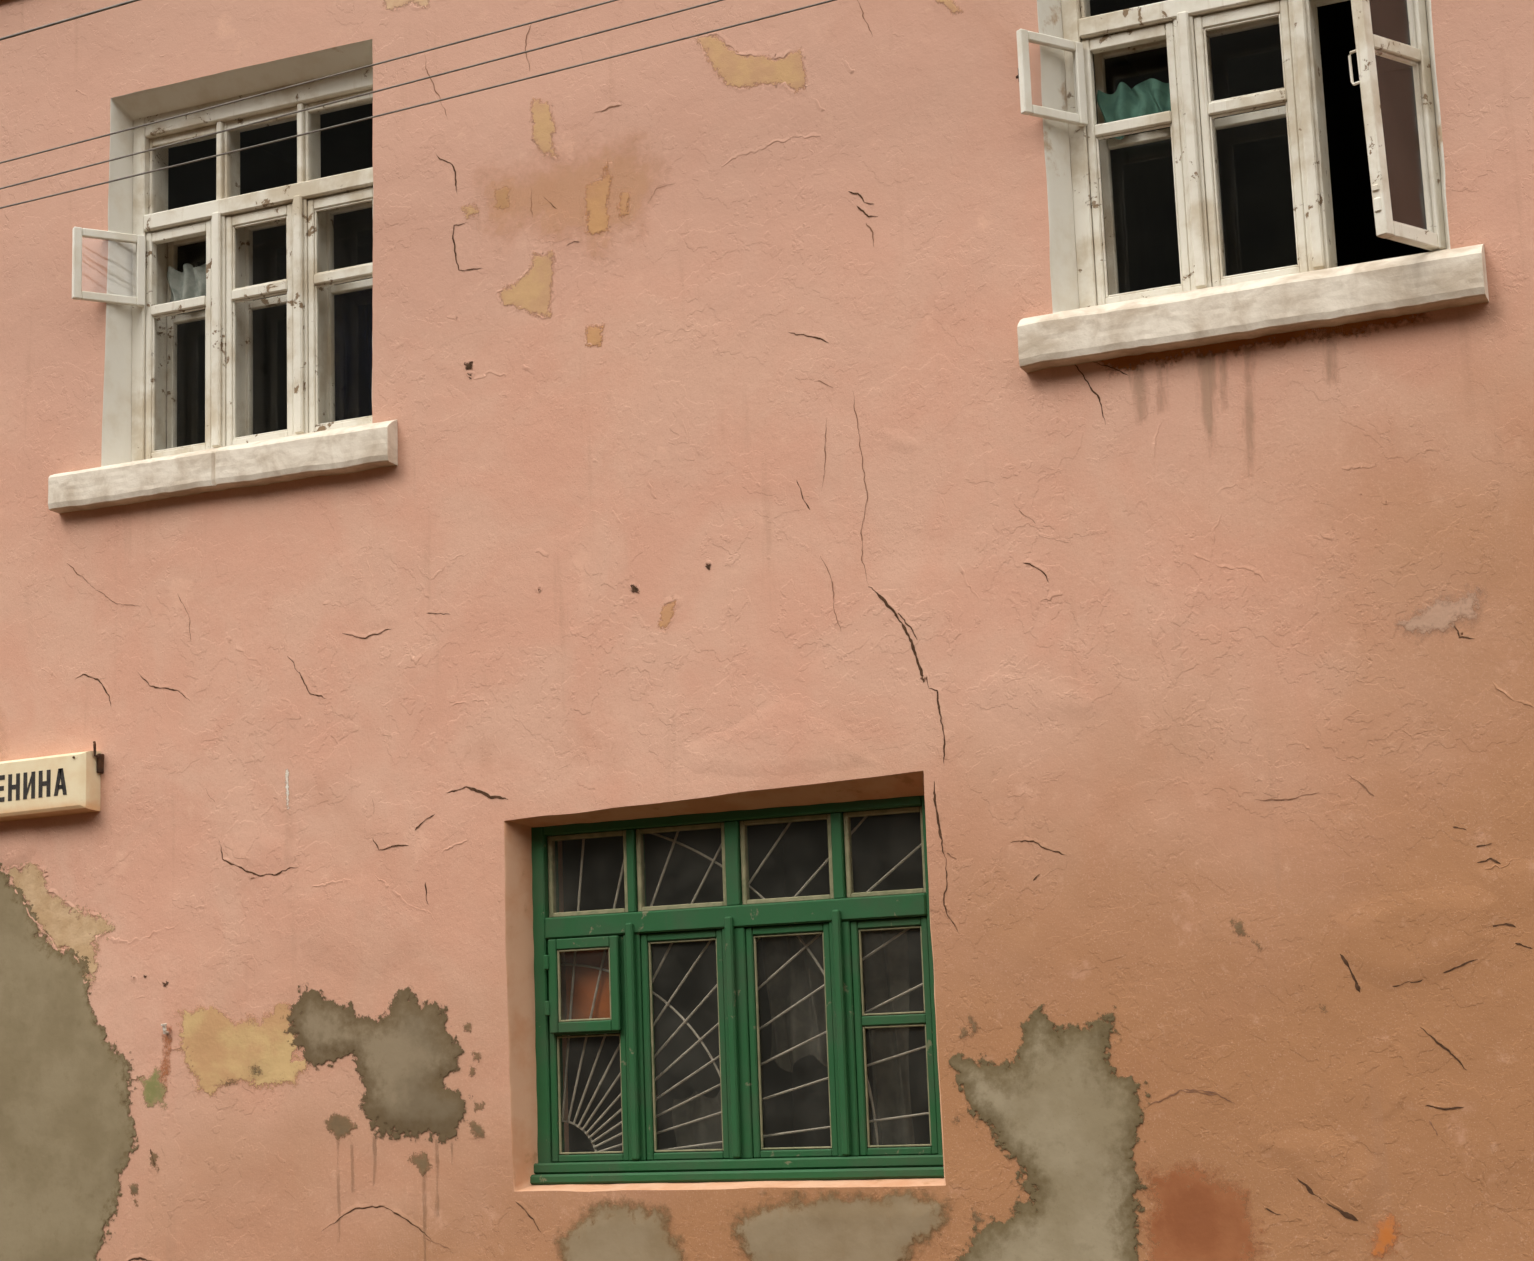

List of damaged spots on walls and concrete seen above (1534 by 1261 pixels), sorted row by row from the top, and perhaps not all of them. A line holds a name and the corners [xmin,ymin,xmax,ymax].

peeling [695,31,809,97]
peeling [529,98,563,162]
peeling [582,161,634,237]
peeling [495,247,557,320]
crack [788,330,829,343]
crack [797,380,960,935]
peeling [5,862,118,989]
peeling [175,1003,307,1096]